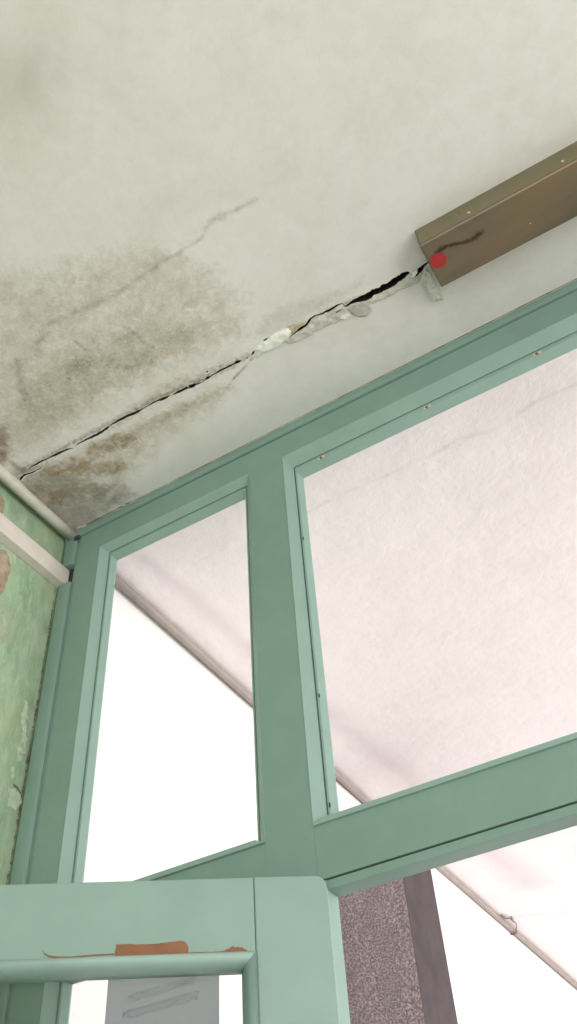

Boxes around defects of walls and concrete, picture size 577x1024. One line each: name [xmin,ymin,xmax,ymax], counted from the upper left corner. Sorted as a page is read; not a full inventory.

spalling [286,268,444,344]
crack [19,262,428,480]
crack [86,278,577,525]
spalling [0,549,11,594]
peeling [7,698,28,810]